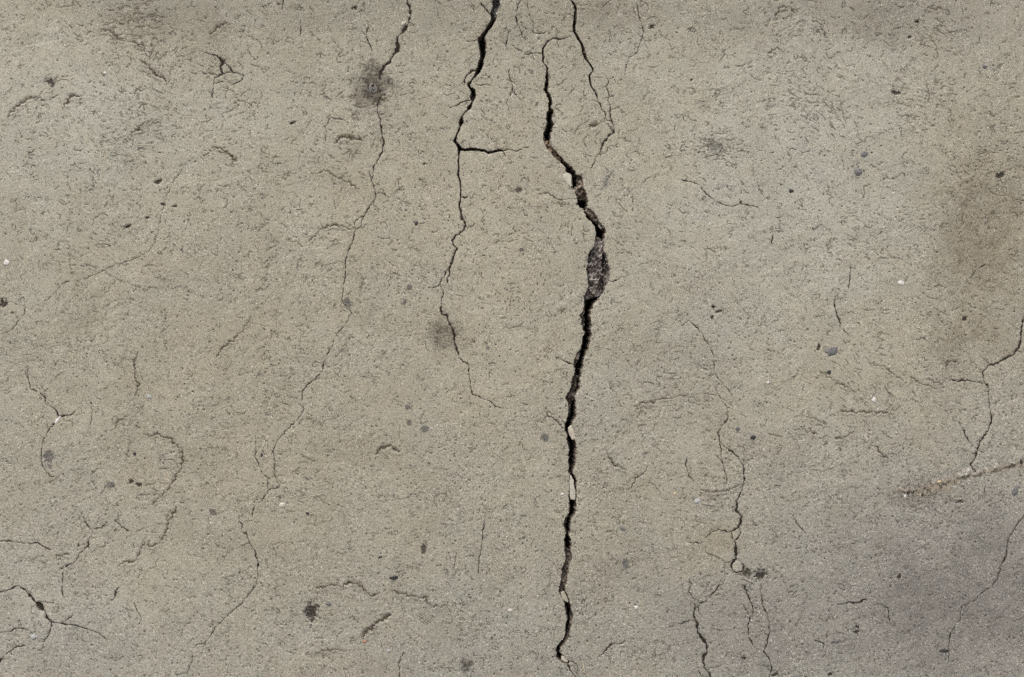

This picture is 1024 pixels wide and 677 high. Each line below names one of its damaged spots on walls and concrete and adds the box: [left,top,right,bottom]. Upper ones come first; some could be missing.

crack [27,371,93,477]
crack [0,514,129,662]
crack [175,0,412,675]
crack [429,0,644,677]
crack [666,320,772,677]
crack [952,316,1024,493]